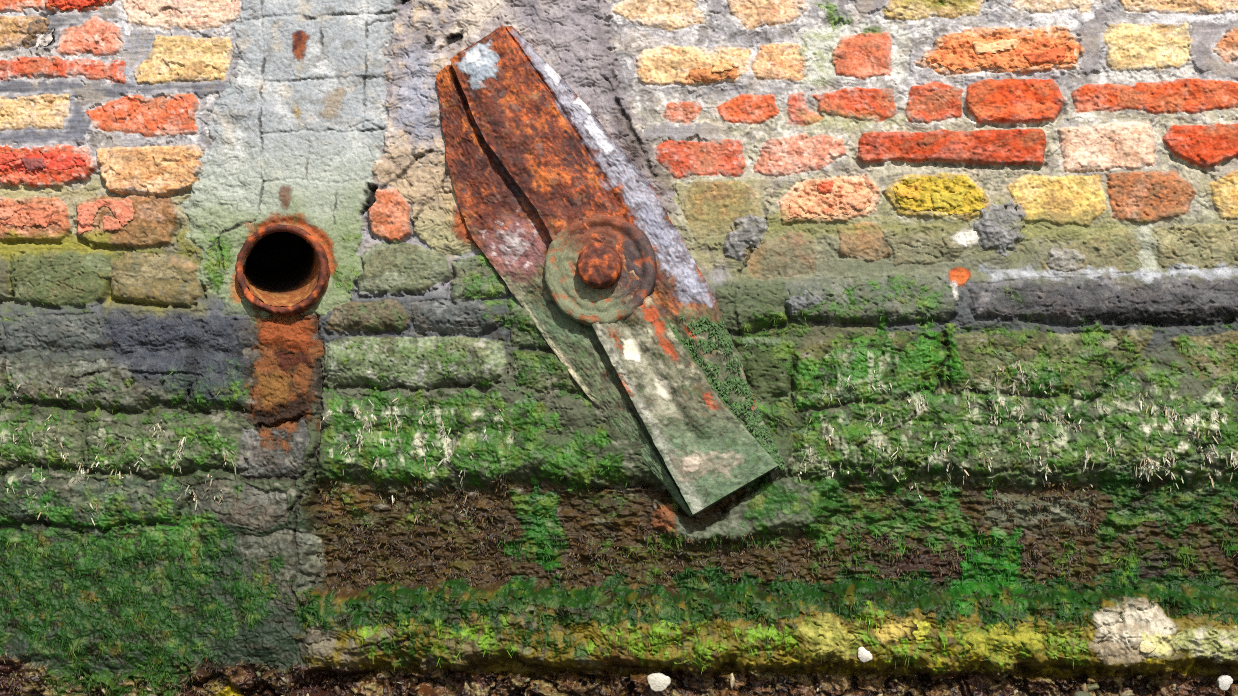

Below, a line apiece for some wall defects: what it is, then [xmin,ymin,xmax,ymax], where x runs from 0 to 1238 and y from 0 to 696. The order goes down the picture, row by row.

rust [253,186,336,272]
rust [454,208,479,248]
leakage [979,224,1238,326]
leakage [105,310,241,400]
rust [233,277,324,450]
rust [653,505,676,533]
leakage [875,618,929,643]
leakage [1093,599,1238,664]